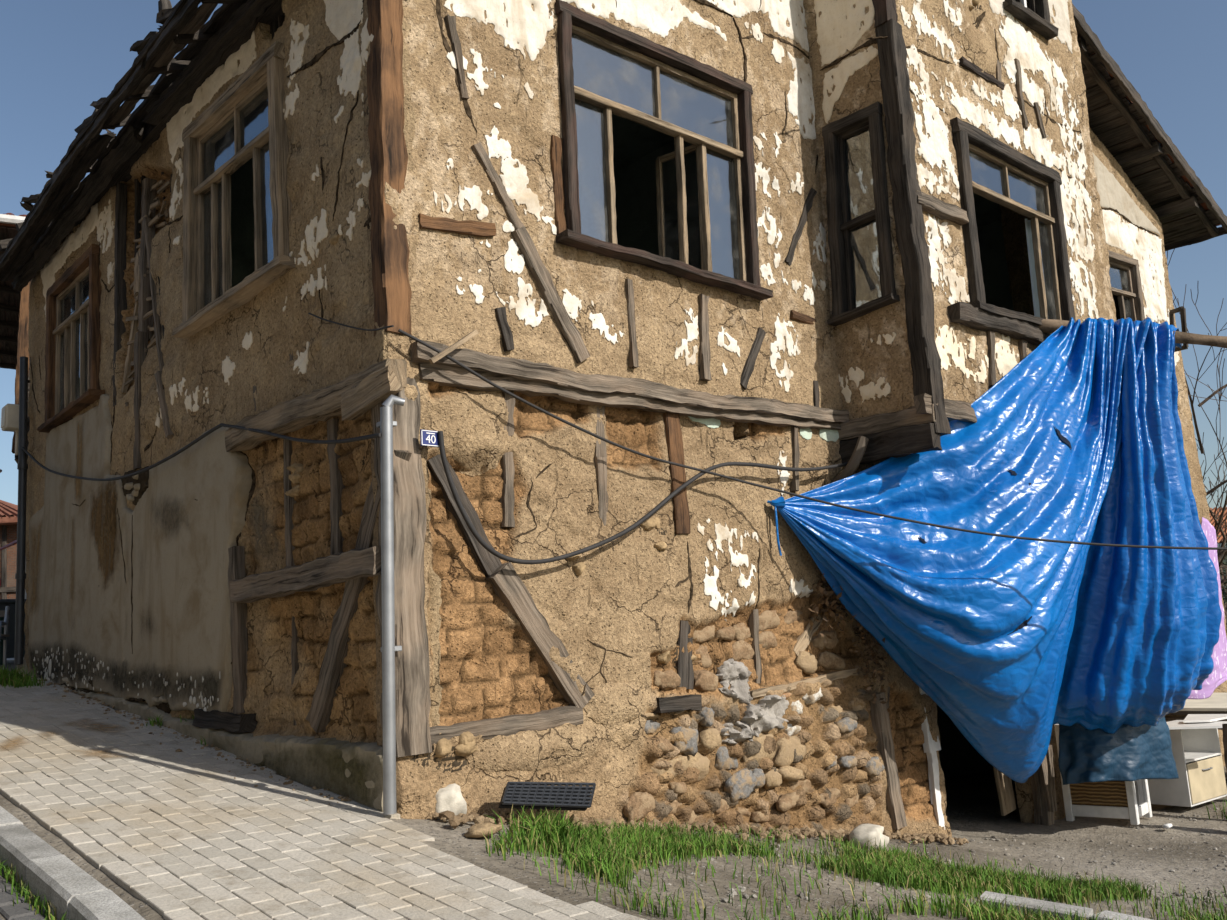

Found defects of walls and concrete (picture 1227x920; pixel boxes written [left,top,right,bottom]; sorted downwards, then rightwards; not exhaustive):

crack [287,0,364,78]
crack [436,0,477,132]
crack [695,0,960,82]
peeling [433,125,557,235]
peeling [753,132,826,305]
peeling [900,0,1098,321]
peeling [456,220,549,327]
peeling [935,325,1019,383]
crack [515,463,553,538]
crack [675,541,694,613]
peeling [697,518,758,621]
leakage [30,646,219,706]